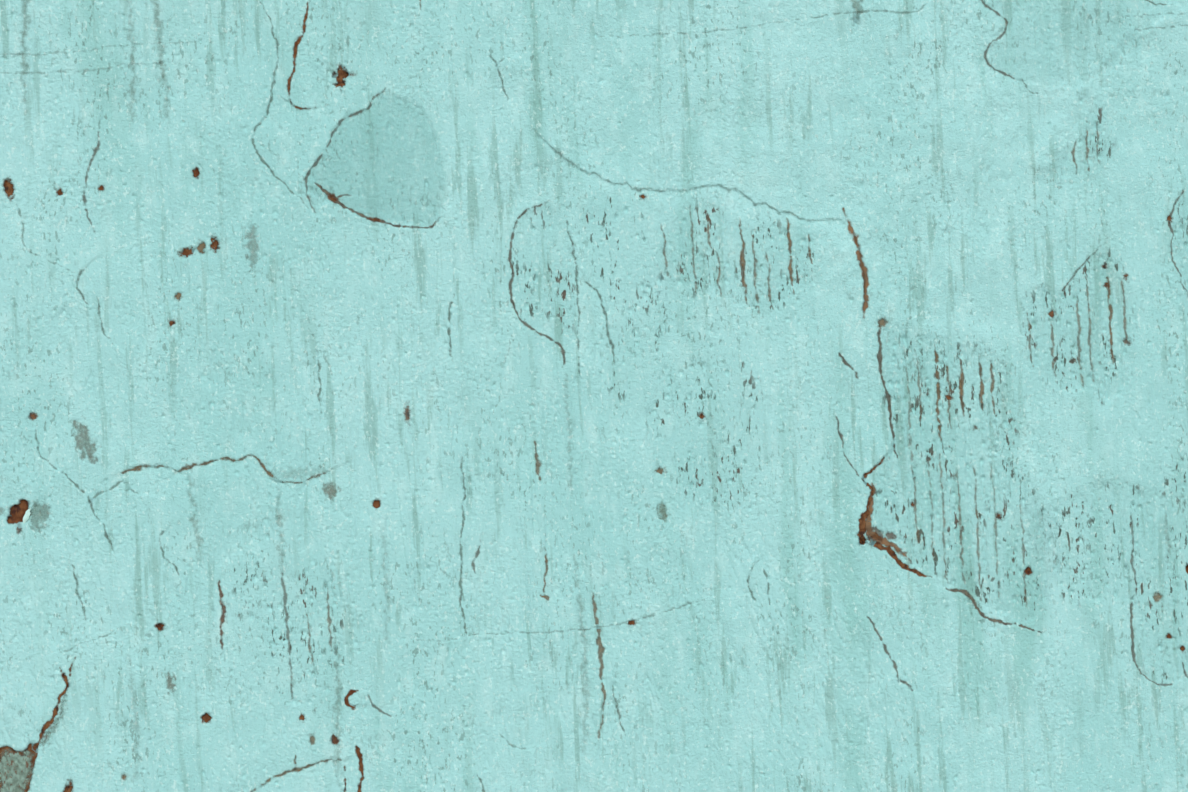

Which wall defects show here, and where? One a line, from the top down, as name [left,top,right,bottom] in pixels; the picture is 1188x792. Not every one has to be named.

crack [252,3,309,193]
crack [842,208,869,313]
crack [587,283,615,375]
crack [36,437,325,545]
crack [837,419,864,481]
crack [946,588,1040,632]
spalling [0,657,76,792]
crack [250,746,364,792]